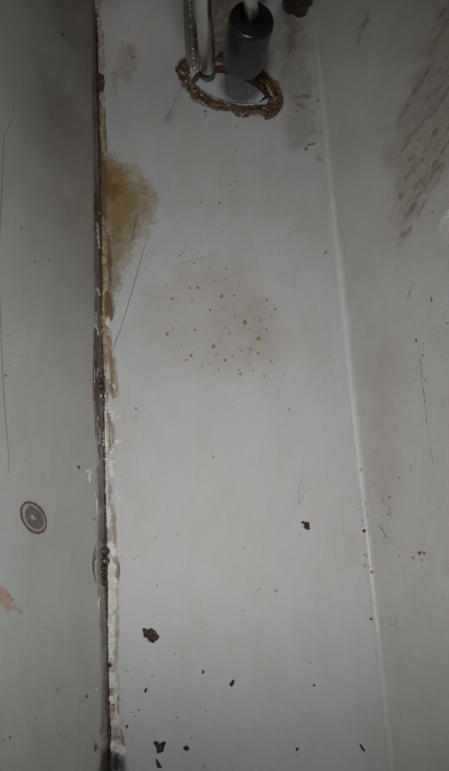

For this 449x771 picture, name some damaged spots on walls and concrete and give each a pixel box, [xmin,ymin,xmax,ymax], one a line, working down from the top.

corrosion [214,0,241,71]
corrosion [176,58,283,120]
leakage [100,752,124,771]